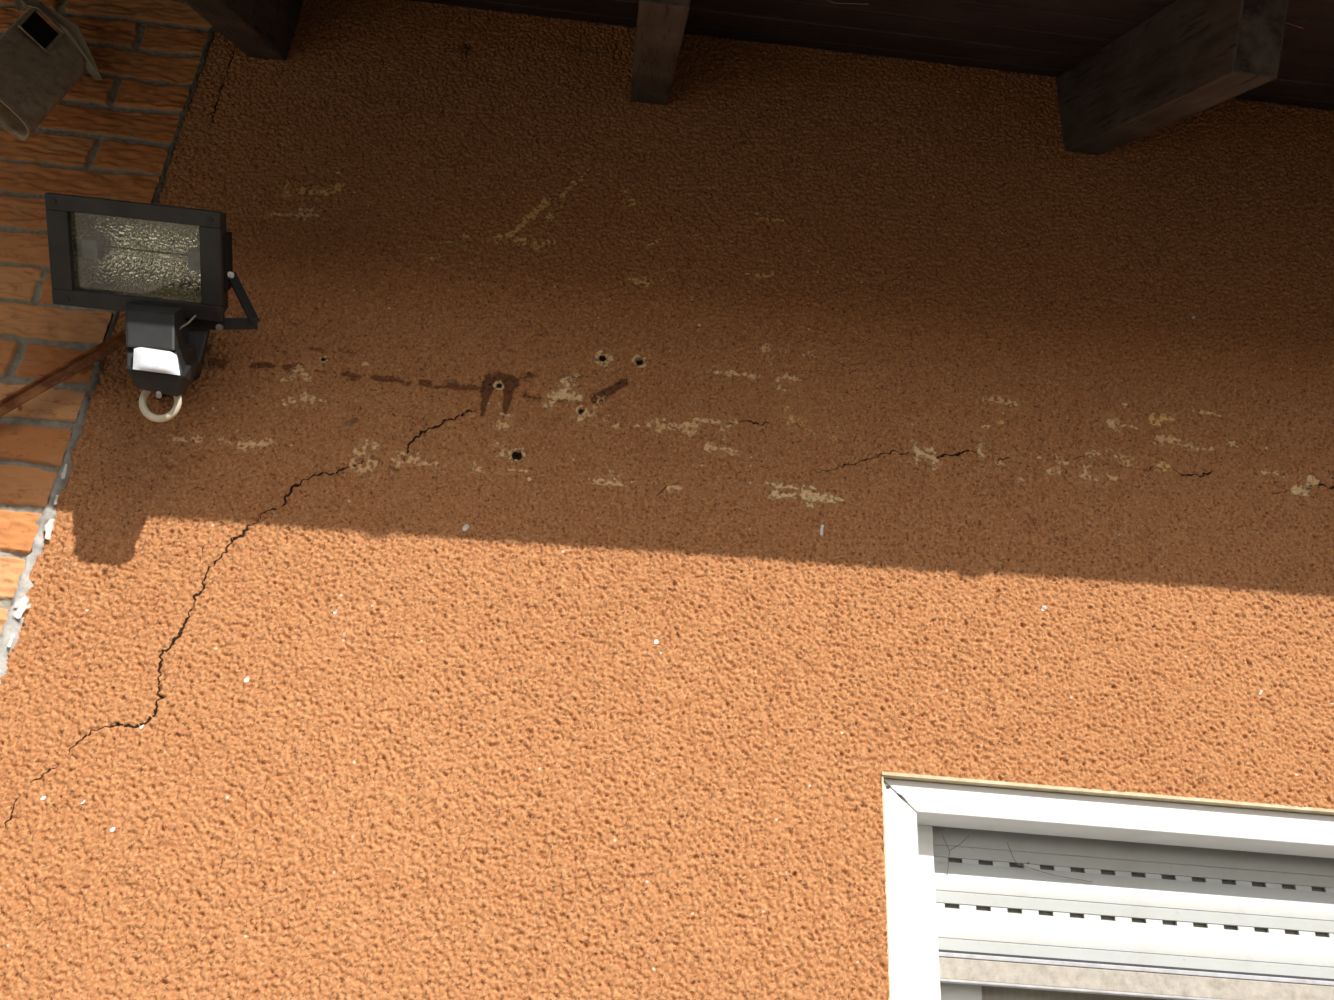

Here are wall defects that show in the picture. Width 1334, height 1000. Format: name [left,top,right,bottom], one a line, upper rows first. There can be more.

peeling [541,372,740,456]
crack [399,409,478,461]
peeling [765,482,844,509]
crack [811,450,1010,473]
crack [1121,464,1214,477]
spalling [1260,469,1319,497]
crack [4,461,366,831]